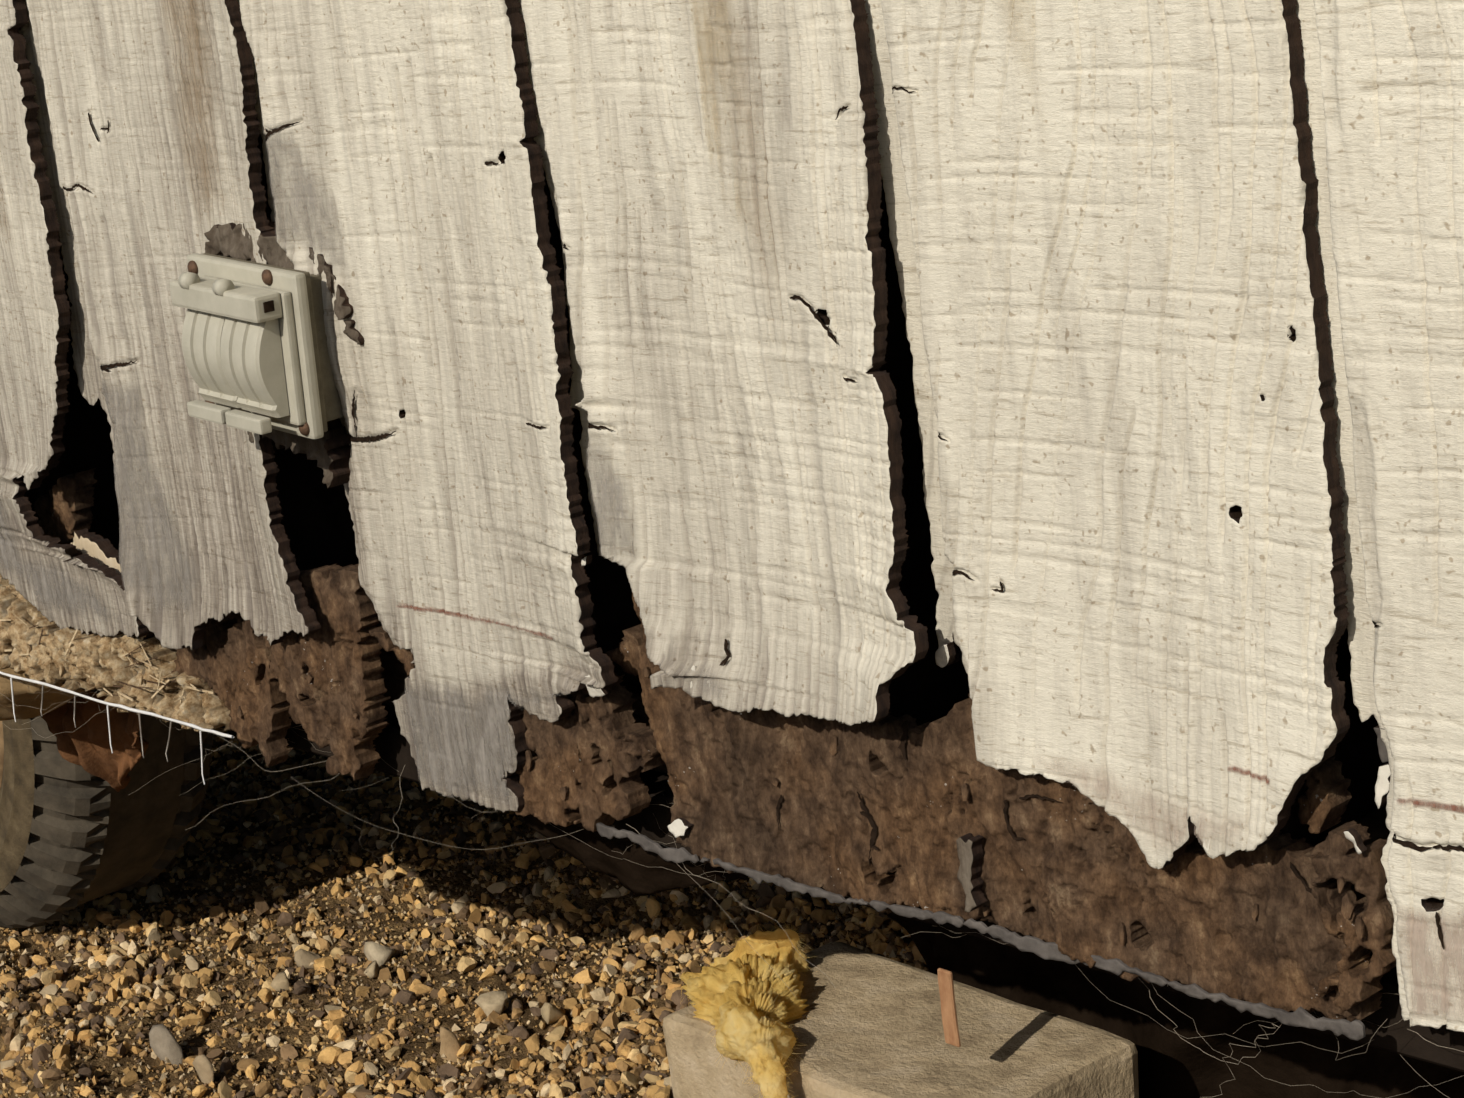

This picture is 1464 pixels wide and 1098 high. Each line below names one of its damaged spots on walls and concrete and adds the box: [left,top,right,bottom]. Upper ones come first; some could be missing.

crack [892,86,916,94]
crack [88,113,109,142]
crack [265,122,299,141]
crack [63,184,92,193]
crack [790,295,855,382]
crack [100,360,137,372]
crack [588,423,614,431]
peeling [585,675,611,698]
peeling [1374,725,1391,809]
peeling [667,818,694,838]
peeling [1344,828,1367,854]
peeling [1337,877,1357,922]